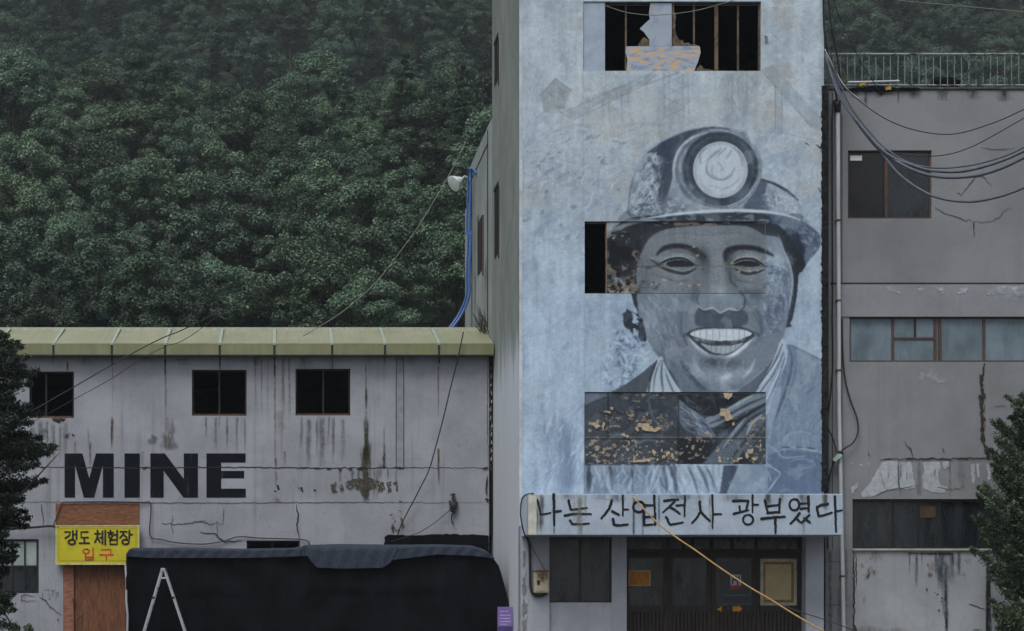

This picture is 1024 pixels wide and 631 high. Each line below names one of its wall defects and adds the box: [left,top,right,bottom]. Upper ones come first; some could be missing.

crack [935,176,1006,238]
crack [41,501,470,543]
peeling [301,467,405,533]
leakage [339,422,388,498]
peeling [850,461,950,497]
crack [868,363,1015,498]
peeling [970,463,991,485]
leakage [908,552,960,631]